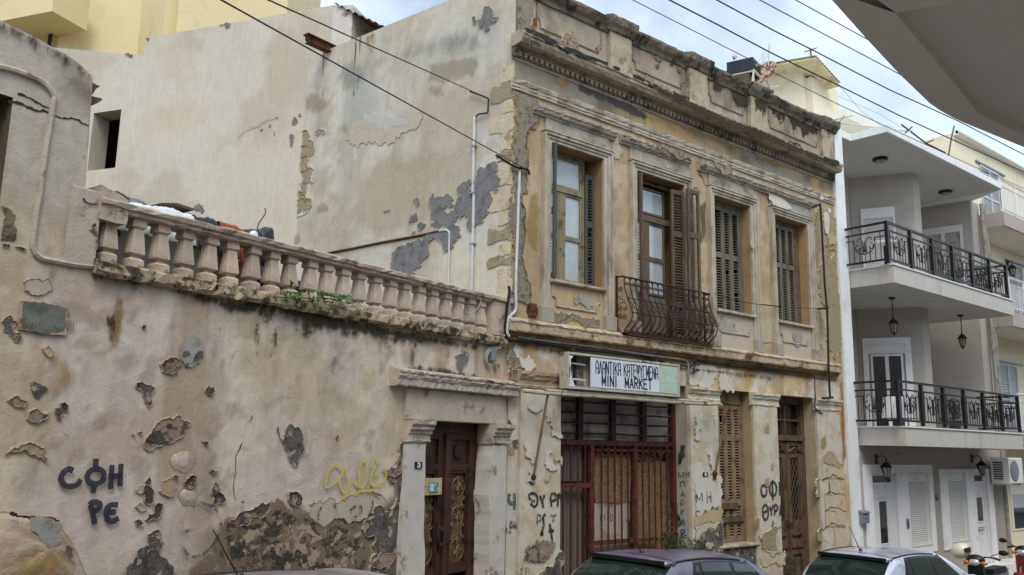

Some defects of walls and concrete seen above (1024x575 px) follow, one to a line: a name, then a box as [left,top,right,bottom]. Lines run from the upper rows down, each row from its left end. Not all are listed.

peeling [472,5,499,32]
spalling [289,113,326,214]
peeling [390,91,539,305]
leakage [658,82,839,167]
spalling [134,381,155,407]
spalling [132,414,191,452]
peeling [158,335,204,376]
peeling [282,423,305,468]
leakage [178,290,478,377]
peeling [126,474,197,575]
spalling [188,442,403,575]
peeling [524,540,565,575]